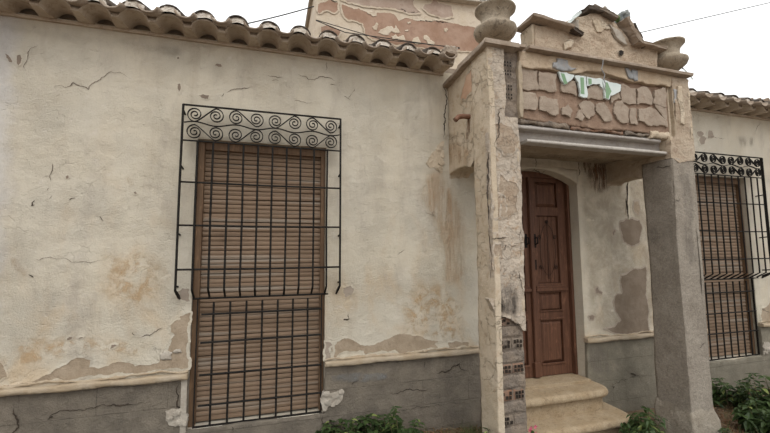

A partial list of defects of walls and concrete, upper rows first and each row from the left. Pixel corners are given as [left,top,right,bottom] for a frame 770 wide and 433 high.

peeling [316,0,479,53]
peeling [603,265,650,334]
peeling [0,286,193,386]
peeling [323,332,470,361]